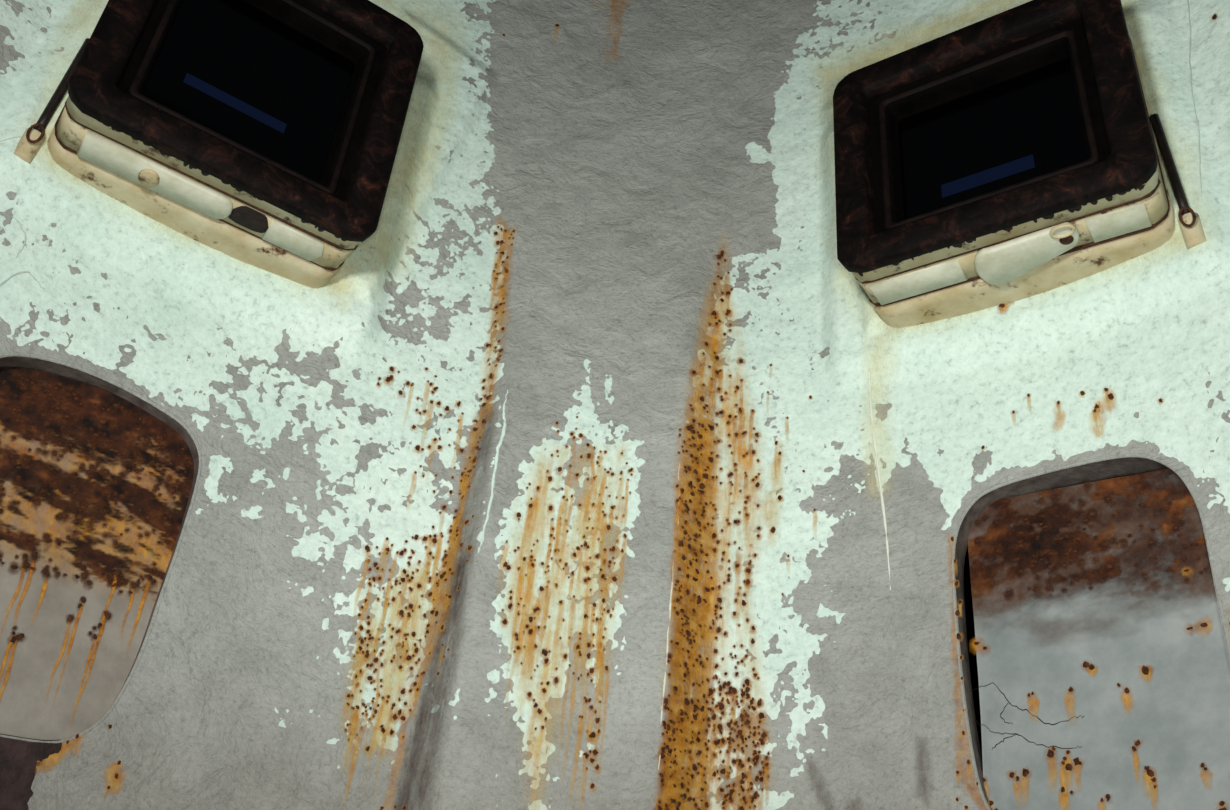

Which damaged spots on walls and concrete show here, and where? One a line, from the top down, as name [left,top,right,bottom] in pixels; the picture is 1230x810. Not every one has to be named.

corrosion [36,733,81,769]
corrosion [0,366,194,699]
corrosion [344,226,515,810]
peeling [0,0,897,810]
corrosion [501,416,633,789]
corrosion [656,251,776,810]
peeling [682,437,1230,810]
corrosion [1009,768,1029,795]
corrosion [1047,746,1082,809]
corrosion [951,468,1216,616]
corrosion [1132,739,1157,796]
peeling [1205,372,1230,423]